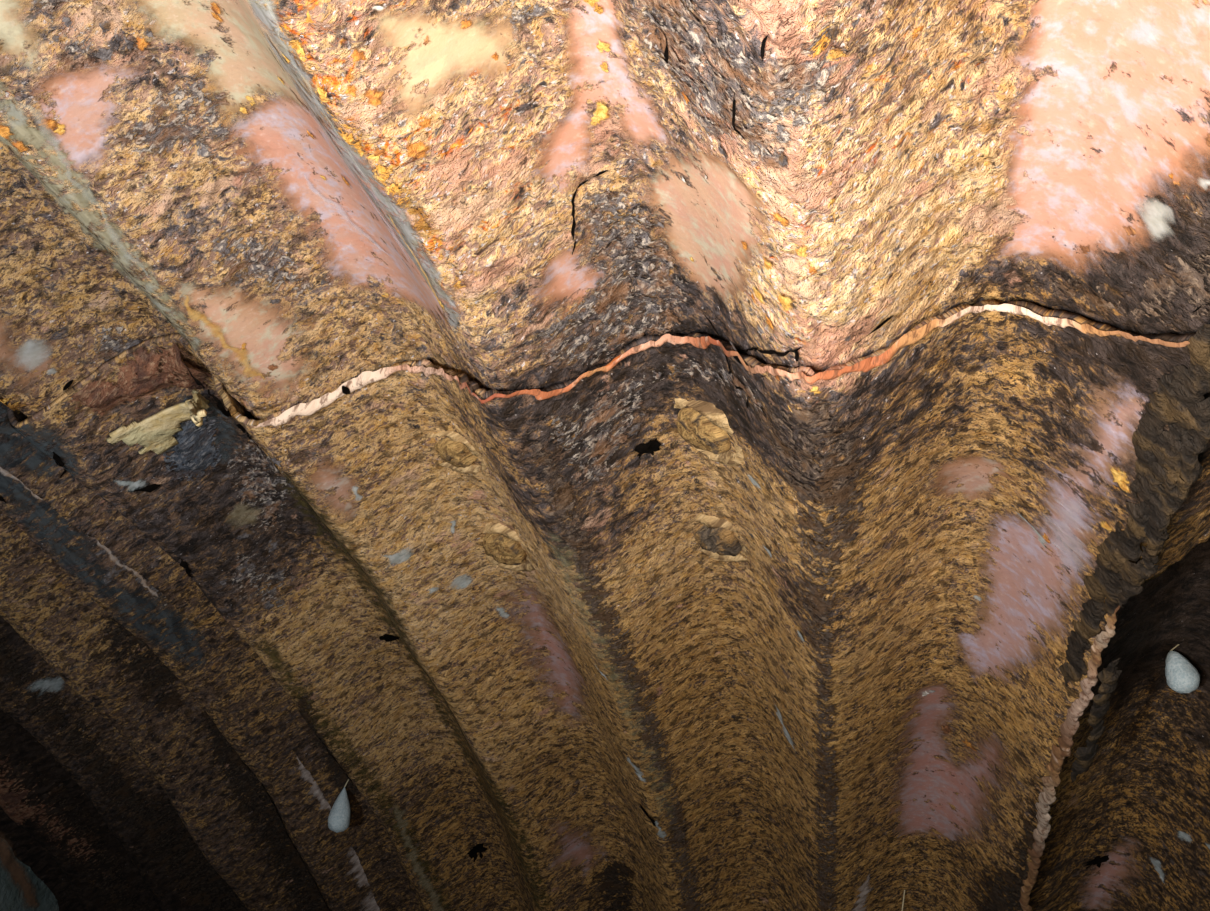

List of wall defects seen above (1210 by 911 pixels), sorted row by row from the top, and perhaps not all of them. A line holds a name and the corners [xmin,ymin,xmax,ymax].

corrosion [274,19,311,69]
corrosion [352,49,365,62]
damp [249,0,459,330]
corrosion [315,83,470,309]
damp [1144,202,1171,236]
crack [857,315,894,344]
crack [342,386,350,394]
crack [703,313,802,438]
peeling [106,388,210,455]